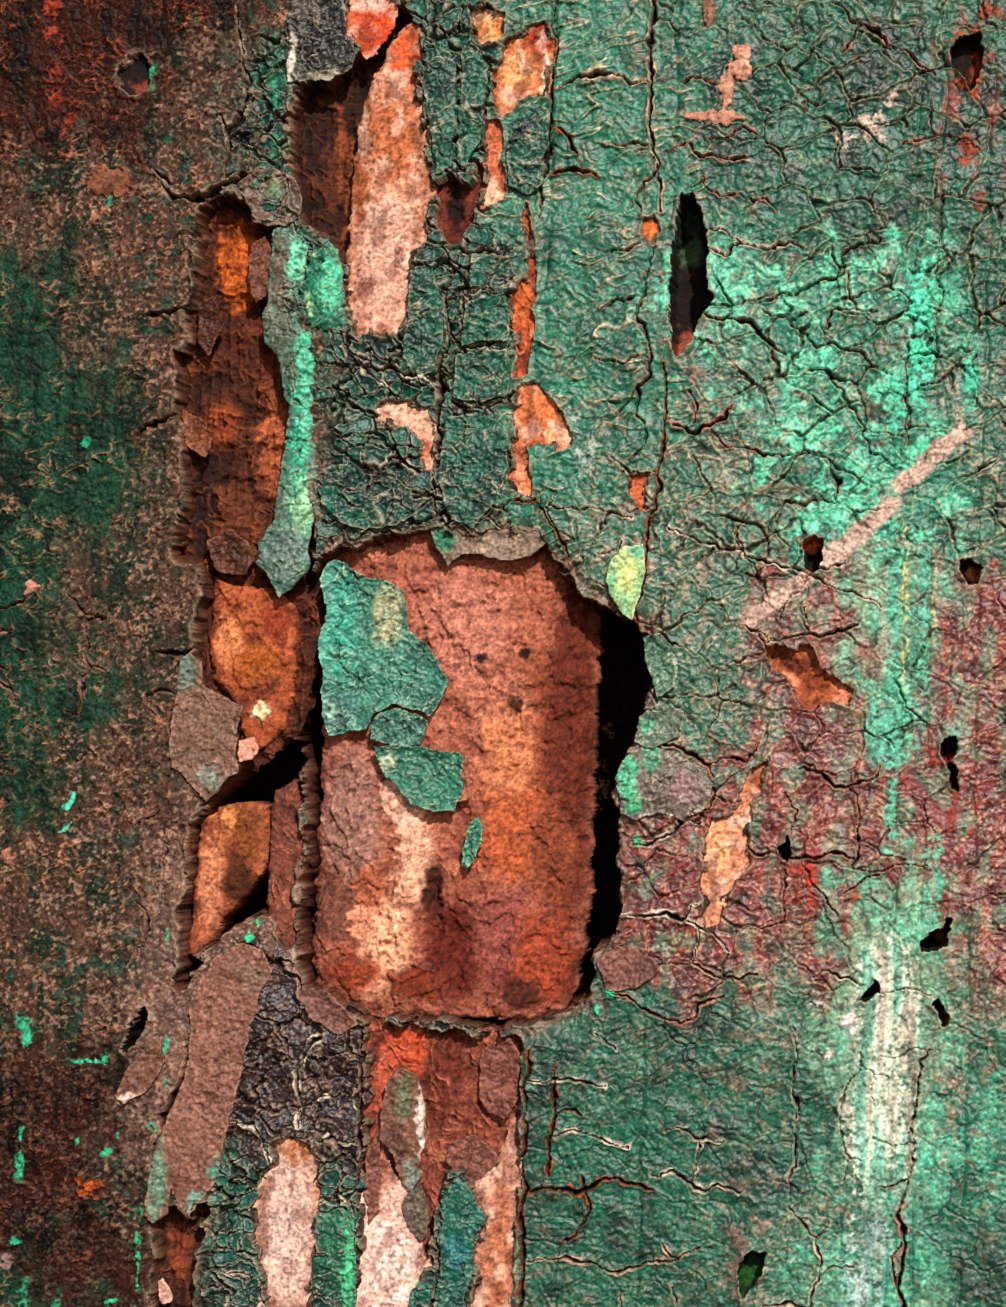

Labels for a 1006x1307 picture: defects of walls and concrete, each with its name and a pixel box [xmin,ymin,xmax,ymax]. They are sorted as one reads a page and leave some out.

rust [43,0,62,44]
rust [46,63,62,101]
crack [538,0,806,258]
crack [498,185,979,644]
spalling [144,0,767,1307]
spalling [766,645,853,709]
rust [791,855,818,917]
crack [750,763,928,929]
rust [947,784,960,832]
rust [75,1178,103,1200]
crack [516,1050,741,1307]
crack [839,1047,932,1307]